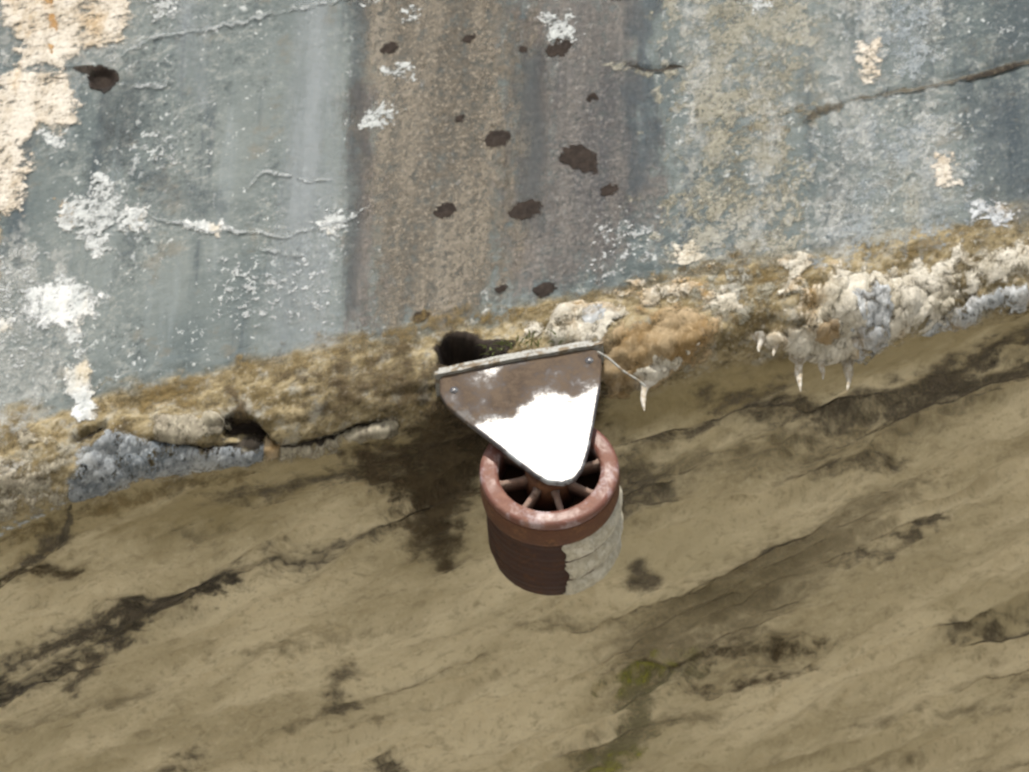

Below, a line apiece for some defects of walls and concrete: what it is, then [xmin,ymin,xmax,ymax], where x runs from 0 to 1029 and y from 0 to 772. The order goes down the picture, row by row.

water stain [0,0,134,216]
crack [799,60,1029,121]
water stain [53,167,152,259]
water stain [205,0,1029,481]
spalling [0,387,400,537]
water stain [0,343,490,714]
water stain [622,484,914,701]
water stain [895,512,947,547]
water stain [944,612,1029,645]